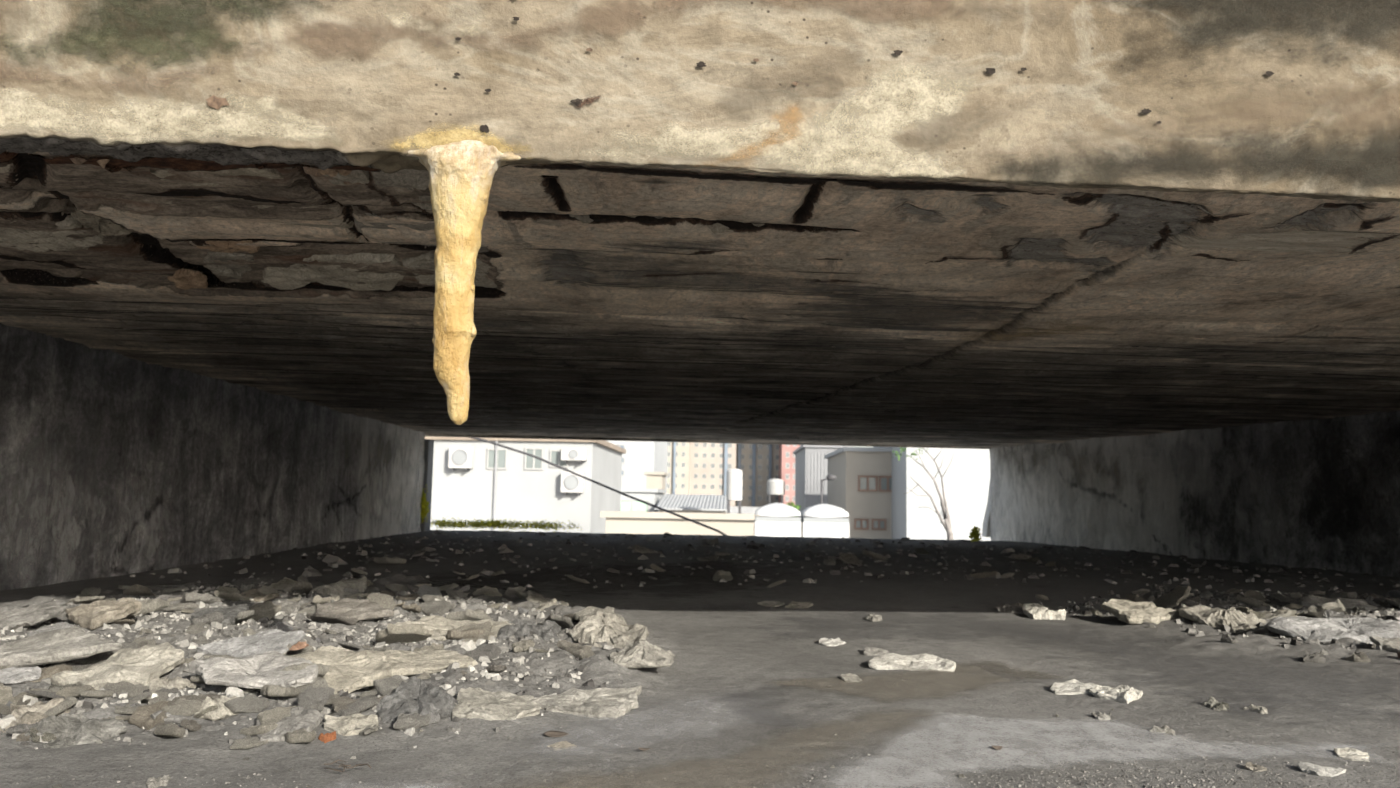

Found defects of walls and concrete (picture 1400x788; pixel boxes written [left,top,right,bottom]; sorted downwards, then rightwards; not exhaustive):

leakage [295,13,483,59]
leakage [0,65,335,145]
leakage [393,127,528,154]
leakage [587,66,970,179]
spalling [0,136,436,299]
crack [792,179,836,224]
spalling [474,246,504,290]
crack [806,258,877,284]
crack [1192,253,1250,262]